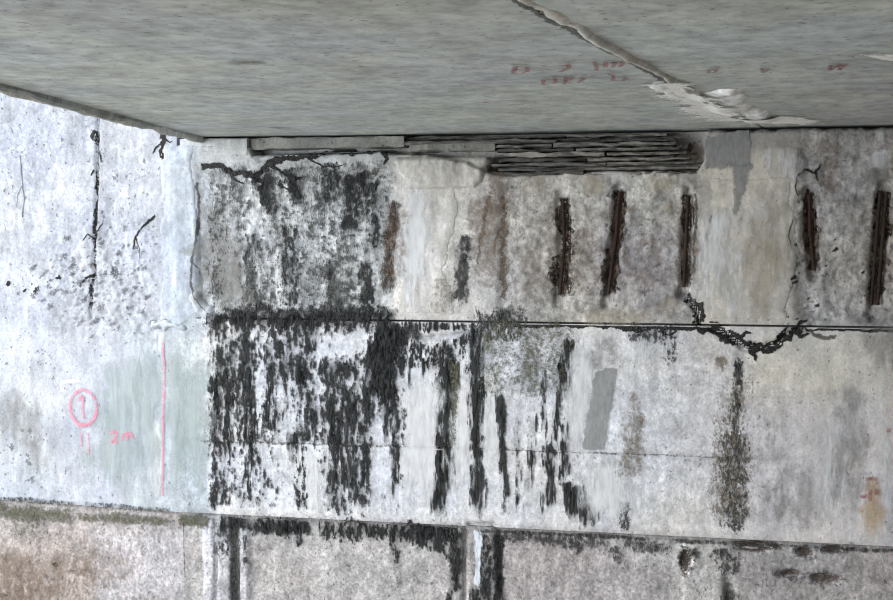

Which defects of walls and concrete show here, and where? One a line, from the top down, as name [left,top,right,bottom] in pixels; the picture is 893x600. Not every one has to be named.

crack [511,0,667,83]
crack [80,119,103,310]
crack [691,194,712,271]
crack [514,293,893,361]
leakage [0,160,893,600]